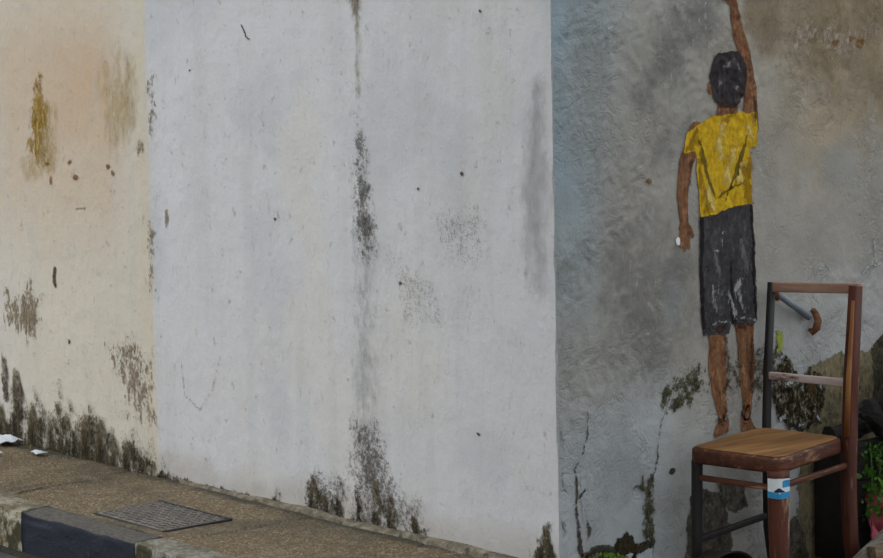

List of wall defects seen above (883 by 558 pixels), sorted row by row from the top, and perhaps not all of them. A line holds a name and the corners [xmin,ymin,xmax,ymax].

water stain [353,133,377,260]
water stain [0,352,194,483]
crack [574,415,592,556]
crack [634,376,678,553]
flaking render [685,484,748,558]
flaking render [789,462,822,558]
flaking render [772,351,845,434]
flaking render [858,335,883,403]